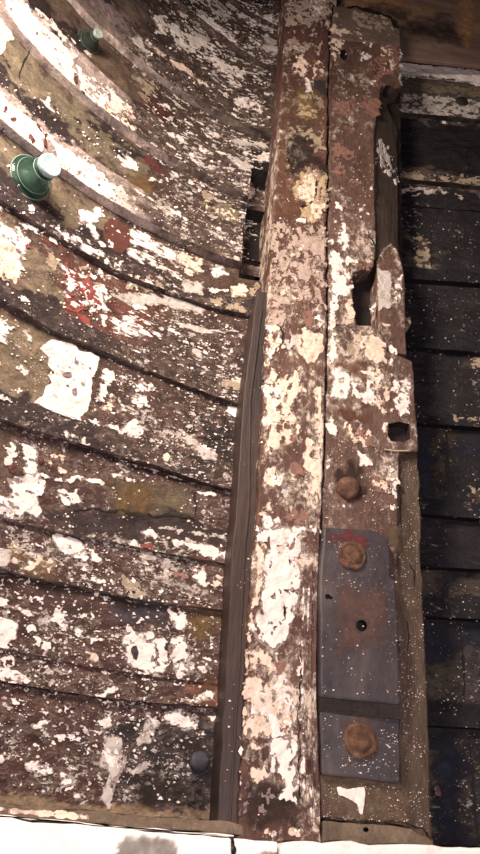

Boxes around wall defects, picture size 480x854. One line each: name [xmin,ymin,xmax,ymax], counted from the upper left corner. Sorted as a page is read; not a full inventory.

peeling [0,0,136,131]
peeling [90,0,480,816]
rust [336,459,366,498]
peeling [0,807,89,820]
crack [326,817,431,840]